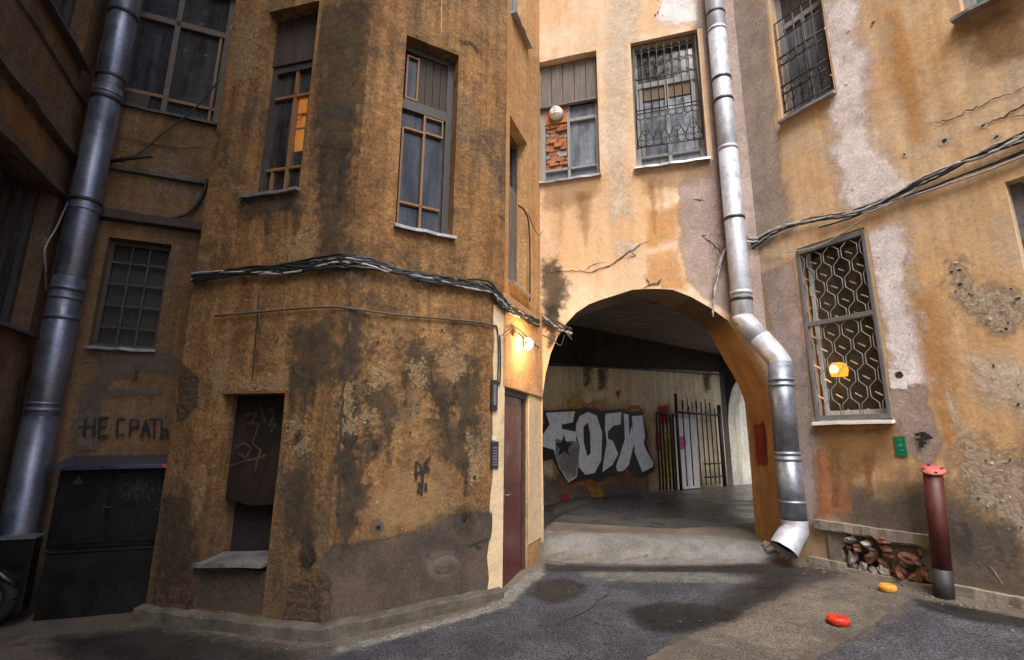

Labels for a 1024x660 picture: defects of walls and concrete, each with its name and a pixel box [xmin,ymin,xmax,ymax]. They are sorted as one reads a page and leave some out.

crack [927,87,1024,127]
crack [548,240,662,289]
spalling [177,357,292,420]
peeling [868,225,1024,555]
damp [431,371,480,494]
spalling [282,544,333,624]